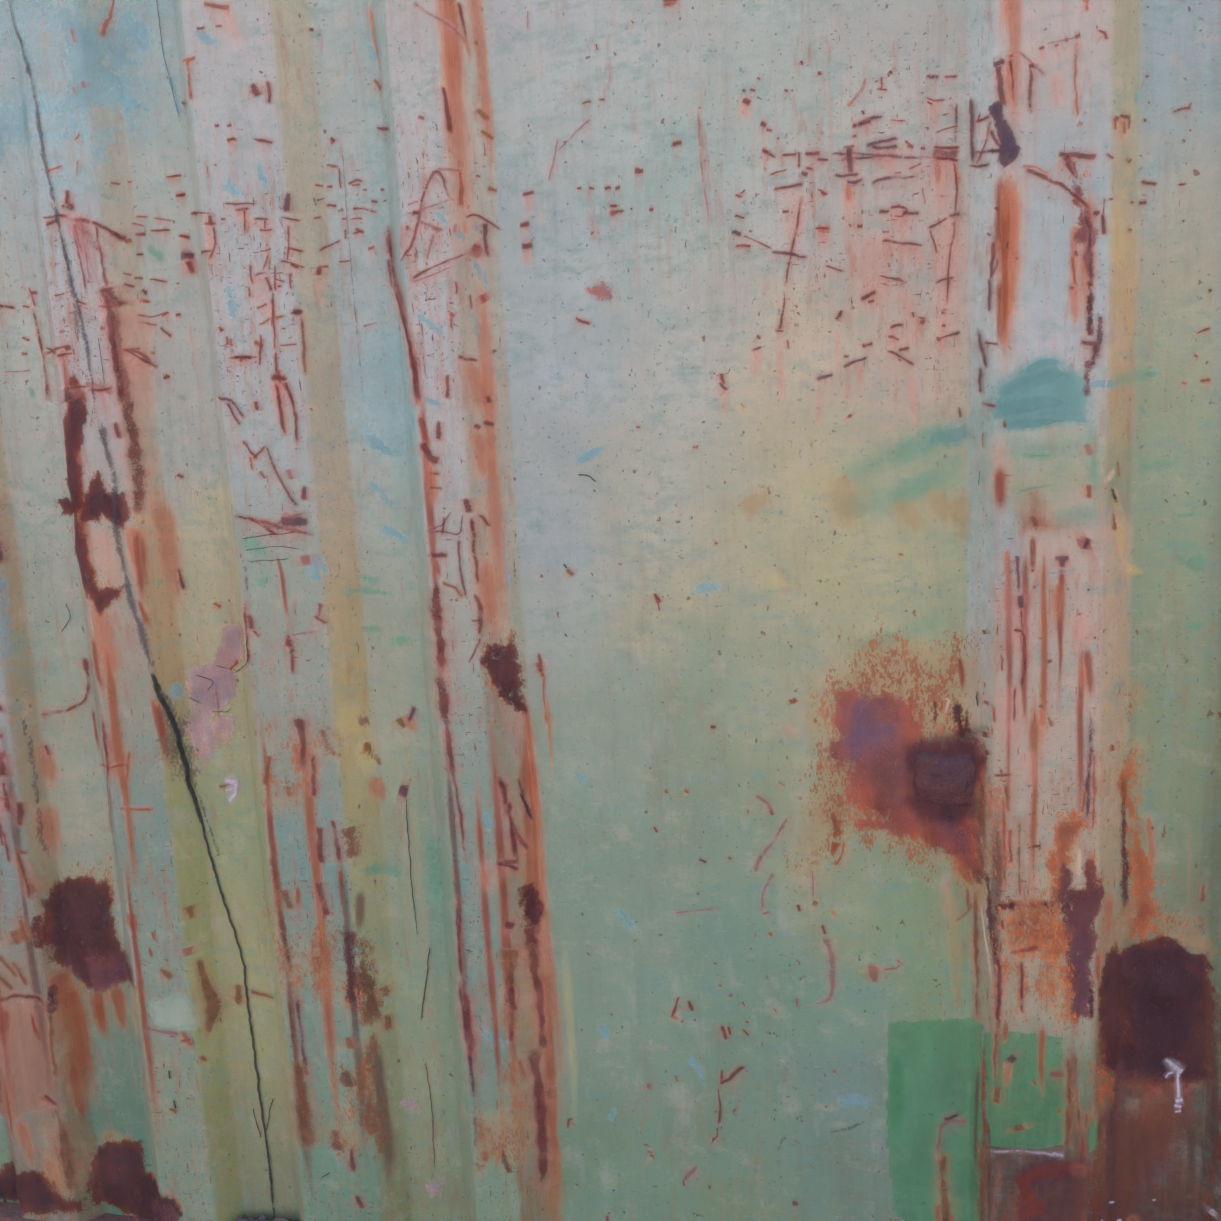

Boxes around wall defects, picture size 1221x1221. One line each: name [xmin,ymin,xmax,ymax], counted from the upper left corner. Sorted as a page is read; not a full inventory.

corrosion [29,190,153,624]
corrosion [0,1094,182,1221]
corrosion [0,734,191,1130]
corrosion [41,641,151,861]
crack [8,0,275,1218]
corrosion [151,700,168,756]
corrosion [197,960,222,1032]
corrosion [442,87,452,132]
corrosion [387,238,572,1197]
corrosion [995,471,1004,505]
corrosion [784,508,1221,1221]
corrosion [969,33,1083,408]